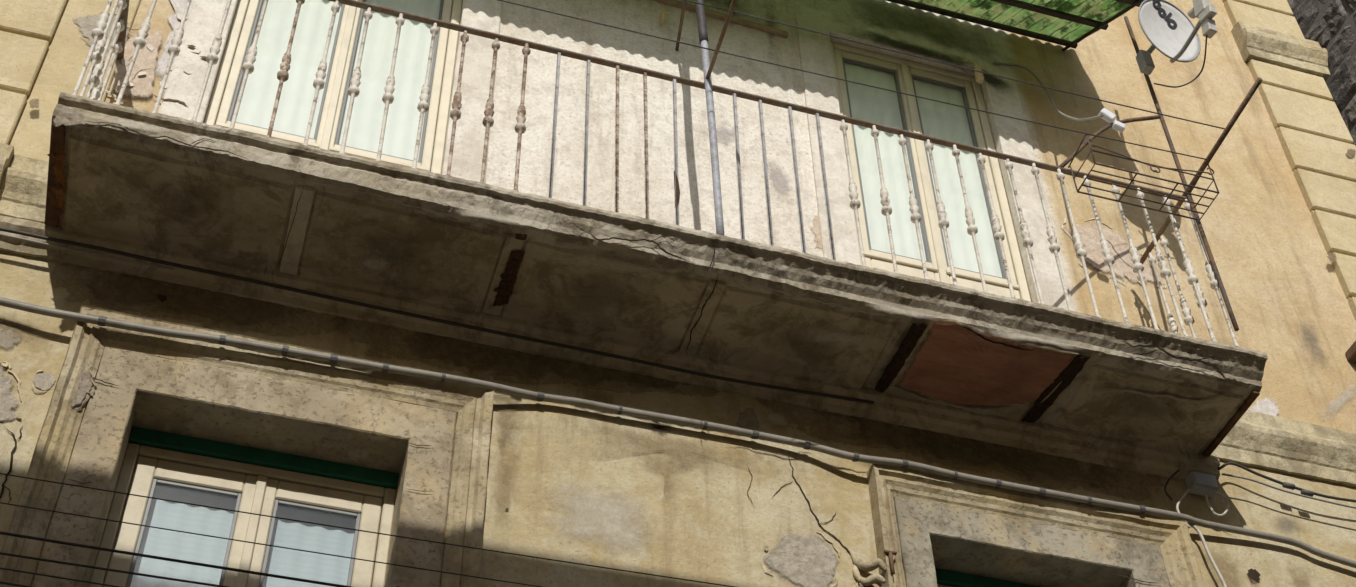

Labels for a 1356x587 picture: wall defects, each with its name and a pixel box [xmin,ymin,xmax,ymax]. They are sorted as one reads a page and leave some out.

peeling [74,0,206,102]
spalling [53,108,85,127]
crack [570,222,889,355]
peeling [0,322,56,421]
spalling [71,368,97,411]
flaking render [880,303,1079,410]
crack [1121,341,1255,390]
crack [0,425,23,503]
crack [746,452,850,553]
peeling [761,532,841,587]